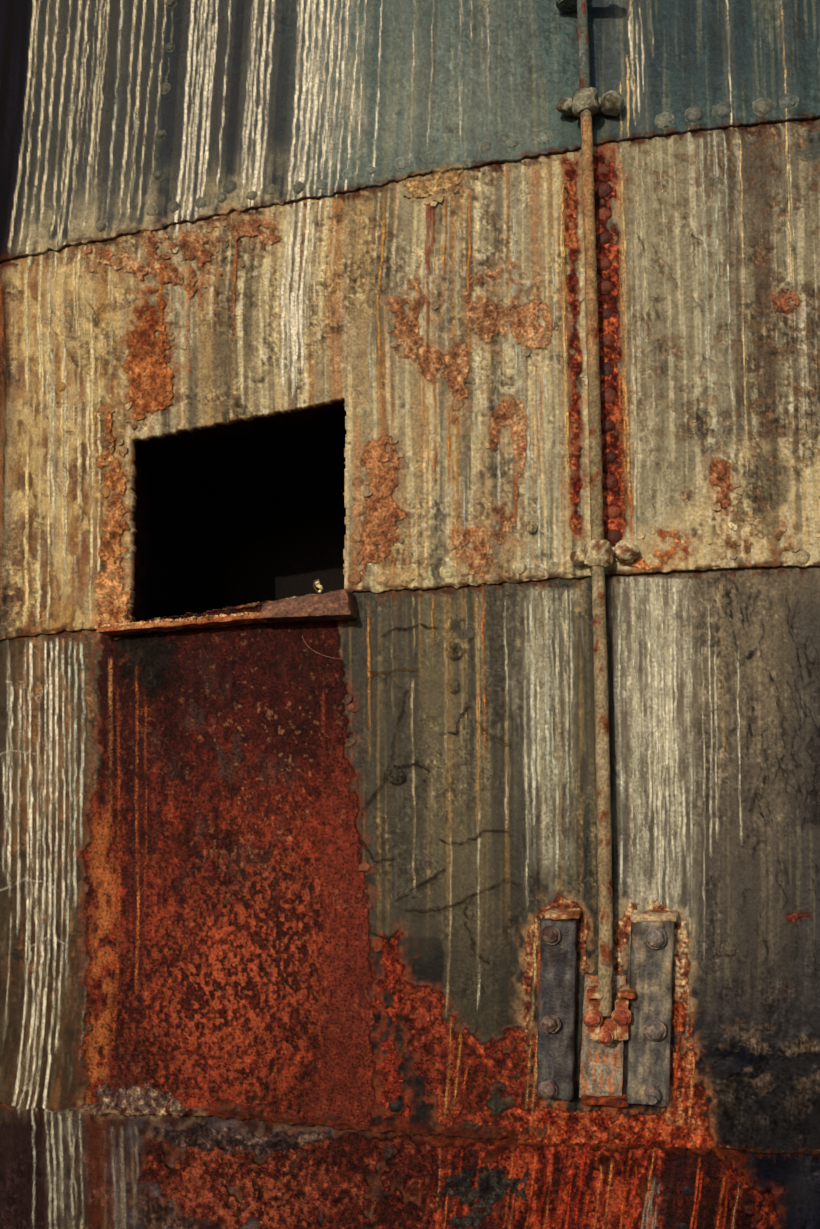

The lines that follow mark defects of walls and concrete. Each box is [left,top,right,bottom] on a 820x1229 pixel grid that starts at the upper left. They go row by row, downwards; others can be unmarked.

water stain [174,0,230,235]
water stain [242,0,274,206]
water stain [281,0,362,393]
water stain [369,220,385,376]
water stain [445,199,471,354]
water stain [526,194,567,567]
rust [562,150,691,570]
peeling [772,520,800,555]
peeling [75,165,779,1229]
water stain [3,640,85,1229]
rust [516,890,713,1151]